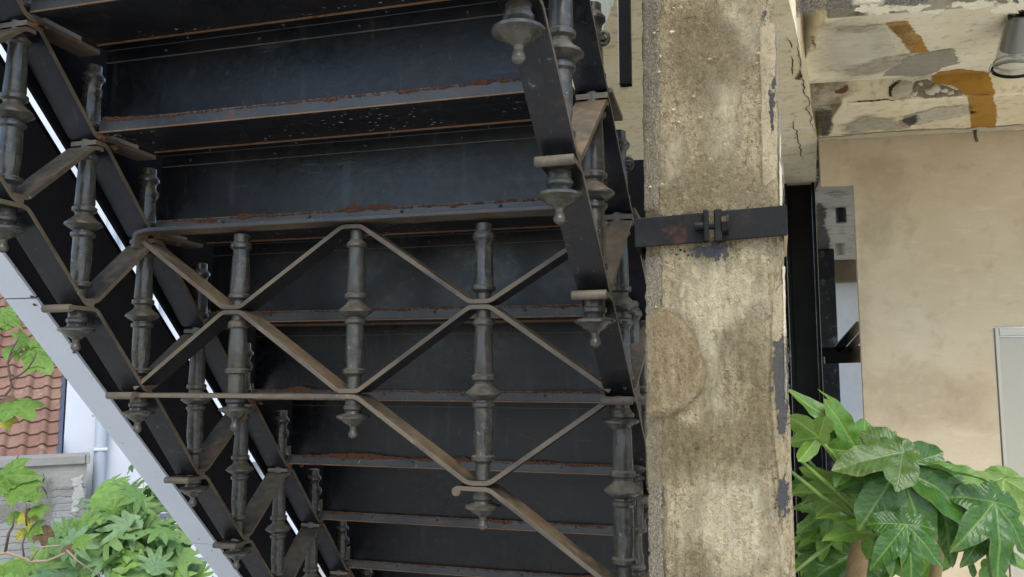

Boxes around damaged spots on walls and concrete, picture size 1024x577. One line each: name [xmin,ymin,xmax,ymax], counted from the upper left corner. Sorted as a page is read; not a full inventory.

peeling [854,0,1024,15]
peeling [769,78,783,206]
crack [776,6,817,202]
peeling [817,79,1024,141]
peeling [769,266,792,442]
peeling [774,473,791,518]